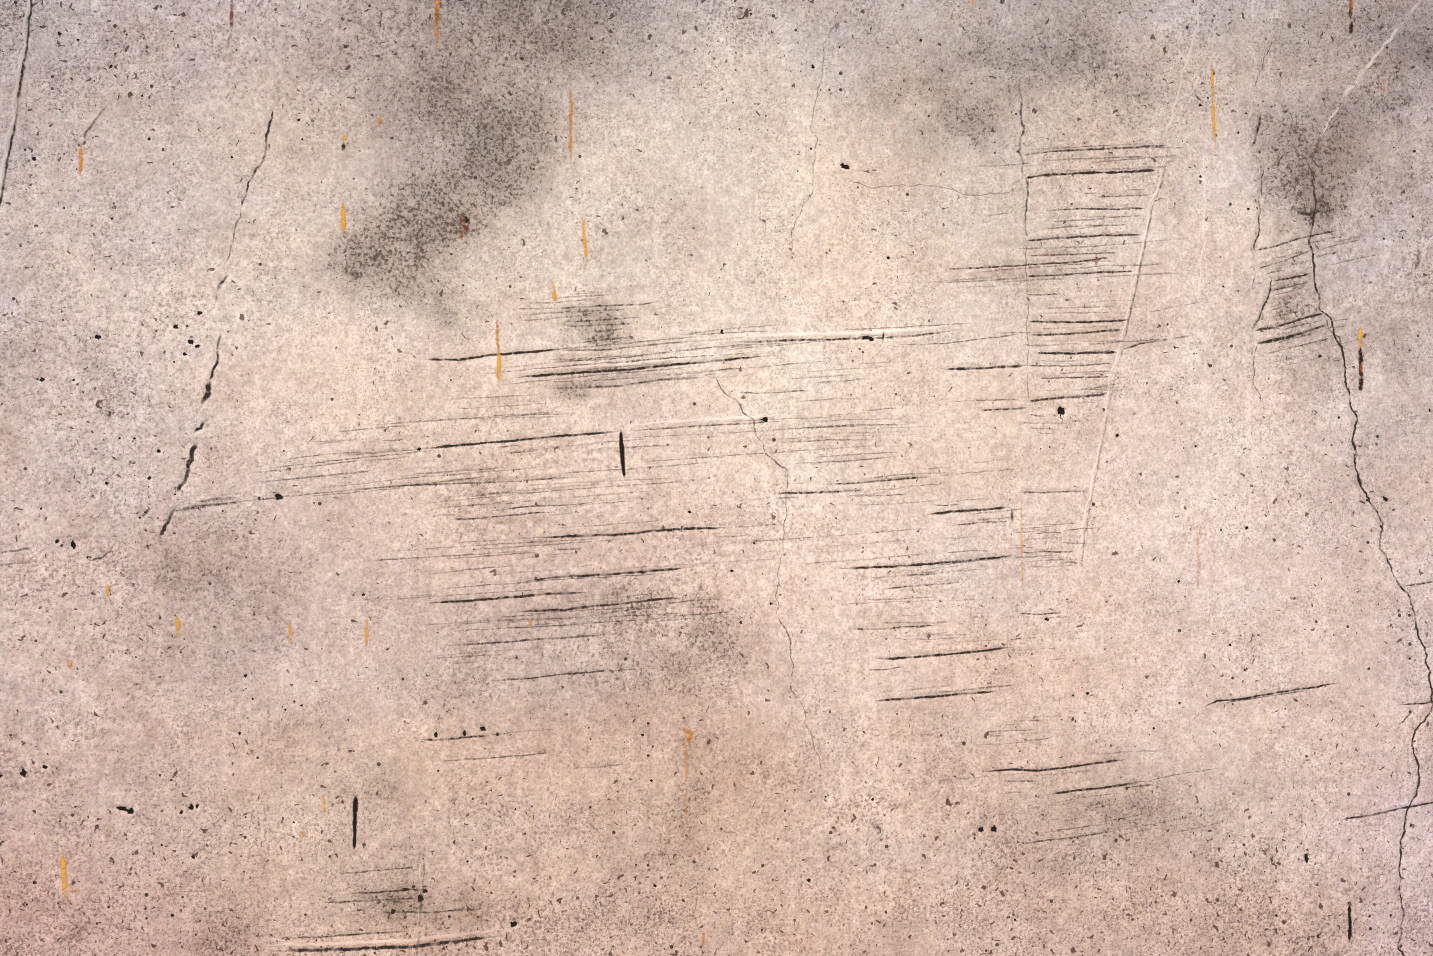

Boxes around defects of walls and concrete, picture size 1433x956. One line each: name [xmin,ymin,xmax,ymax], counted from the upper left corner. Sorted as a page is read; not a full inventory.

crack [219,112,273,285]
crack [145,338,220,533]
crack [1253,110,1433,956]
corrosion [60,857,73,892]